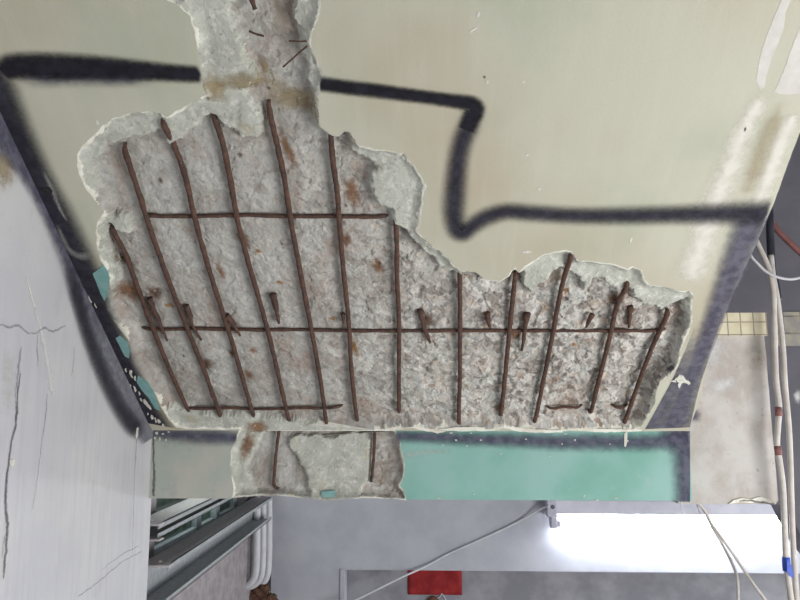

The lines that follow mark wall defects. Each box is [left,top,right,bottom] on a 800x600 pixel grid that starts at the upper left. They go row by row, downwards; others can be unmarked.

rust [346,183,357,201]
spalling [77,0,693,501]
crack [3,374,21,578]
rust [242,423,265,456]